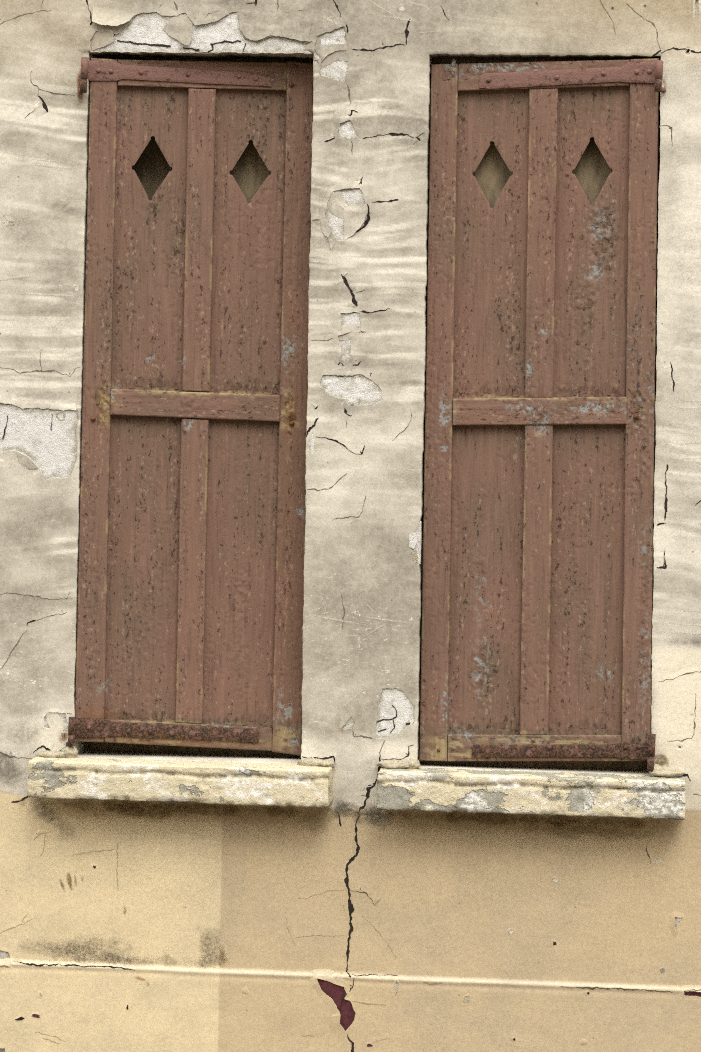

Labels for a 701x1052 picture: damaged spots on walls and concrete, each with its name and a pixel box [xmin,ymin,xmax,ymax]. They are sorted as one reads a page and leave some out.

peeling [80,1,357,89]
crack [600,0,701,54]
peeling [314,306,388,412]
peeling [0,392,78,489]
crack [0,589,70,668]
crack [0,707,72,759]
peeling [338,684,417,742]
crack [302,730,414,1006]
peeling [0,943,18,972]
peeling [309,969,362,1039]
peeling [678,985,701,999]
crack [344,1034,354,1052]